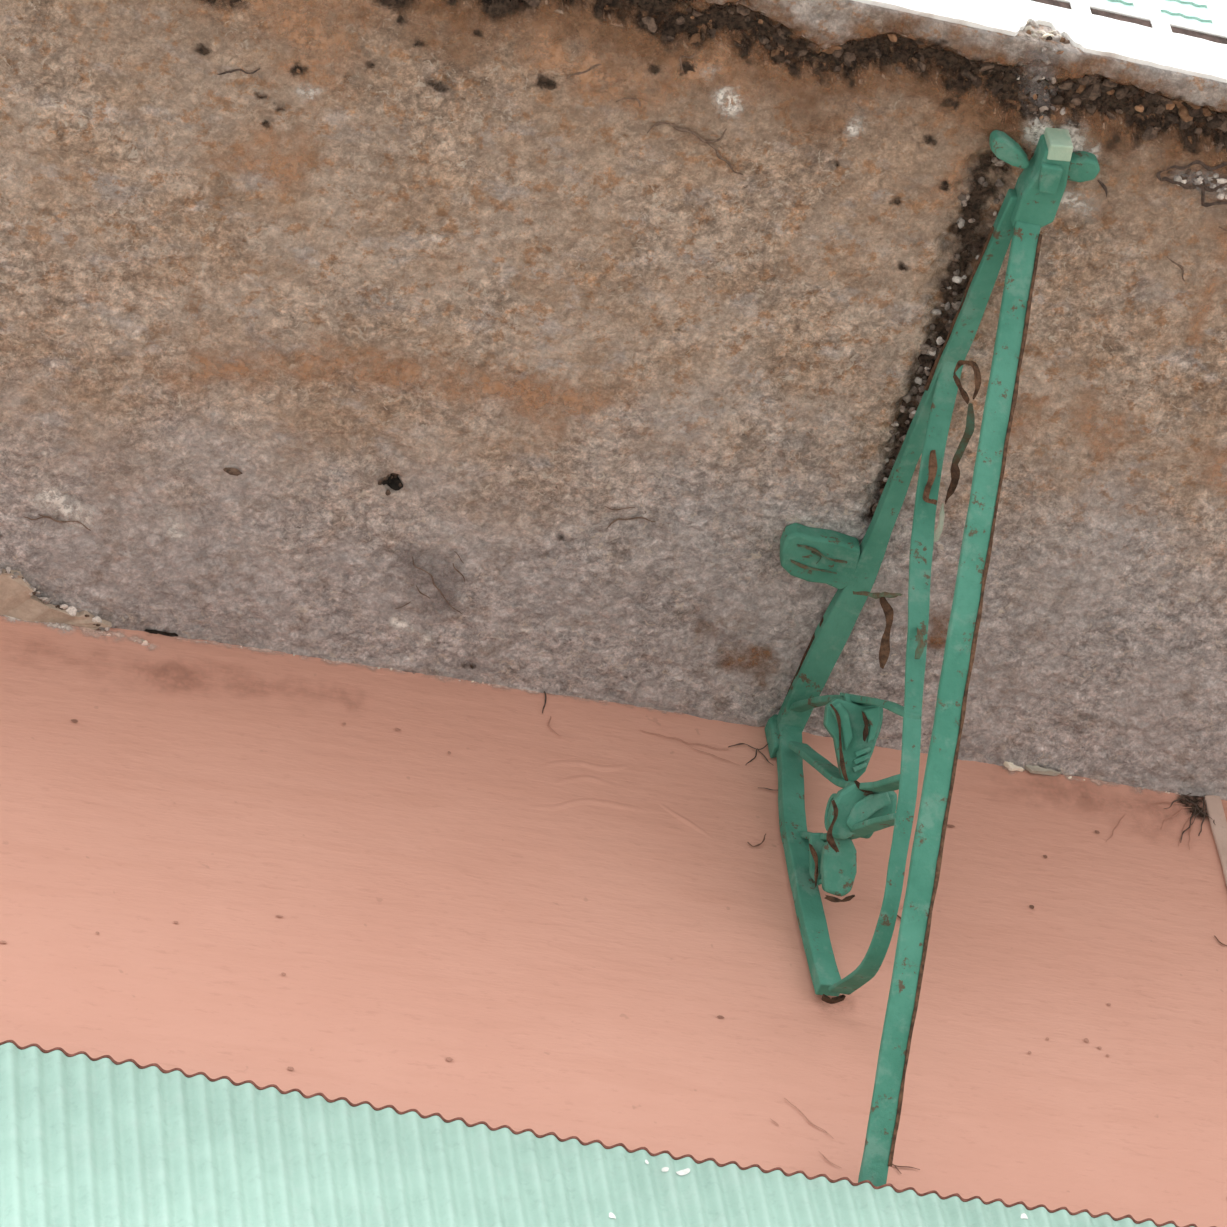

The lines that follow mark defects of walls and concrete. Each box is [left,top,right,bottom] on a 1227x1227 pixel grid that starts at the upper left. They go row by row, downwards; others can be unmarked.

spalling [290,63,307,75]
spalling [397,0,1227,200]
spalling [864,152,1009,520]
spalling [0,566,307,658]